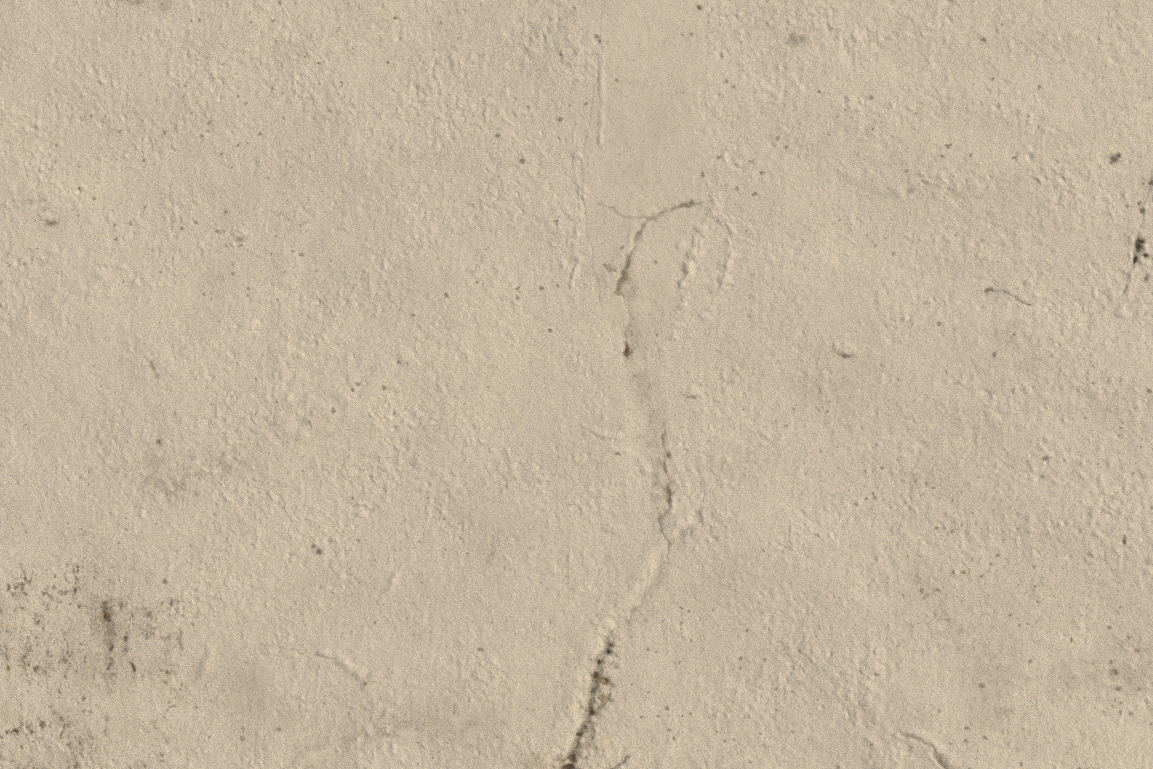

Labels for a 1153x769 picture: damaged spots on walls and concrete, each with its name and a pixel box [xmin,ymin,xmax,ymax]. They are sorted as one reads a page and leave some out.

crack [563,639,622,769]